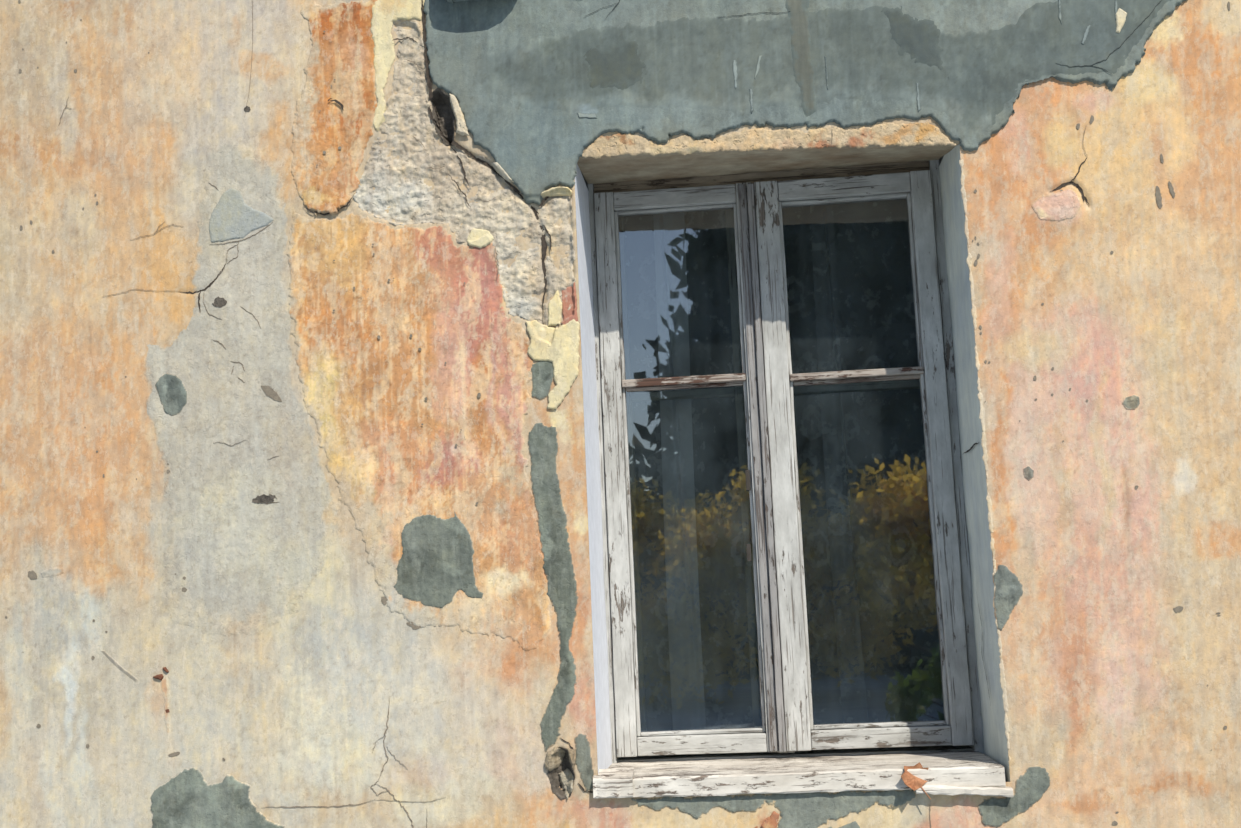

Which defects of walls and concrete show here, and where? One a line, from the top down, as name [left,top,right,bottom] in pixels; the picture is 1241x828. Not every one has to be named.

crack [1066,0,1162,70]
crack [392,0,556,325]
crack [1050,128,1089,204]
crack [103,225,269,383]
peeling [142,0,576,651]
crack [280,696,437,828]
flaking render [544,747,576,800]
peeling [755,811,780,828]